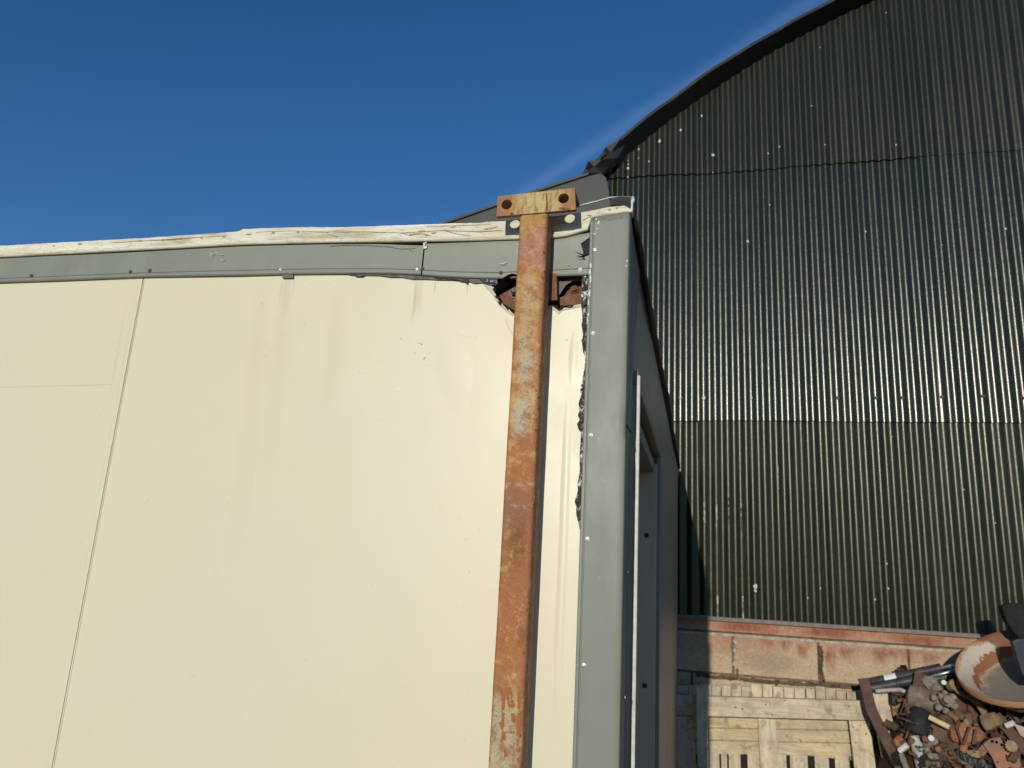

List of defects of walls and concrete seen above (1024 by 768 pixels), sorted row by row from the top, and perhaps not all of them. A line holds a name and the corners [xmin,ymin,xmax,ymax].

corrosion [499,686,521,763]